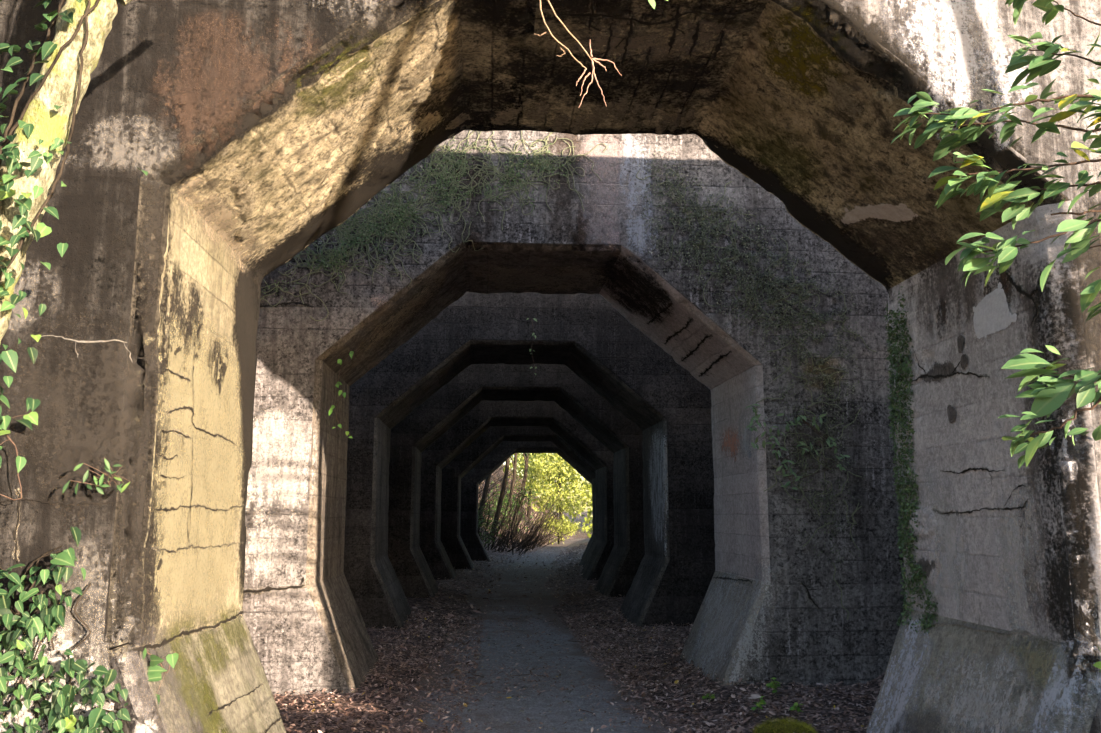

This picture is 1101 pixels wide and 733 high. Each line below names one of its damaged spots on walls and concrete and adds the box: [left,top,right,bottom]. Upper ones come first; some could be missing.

leakage [0,0,773,733]
crack [647,304,732,377]
peeling [923,282,1017,383]
crack [0,488,120,568]
crack [145,353,245,562]
spalling [947,405,956,423]
crack [933,467,1028,515]
leakage [868,199,1101,733]
crack [109,577,310,668]
crack [206,682,265,728]